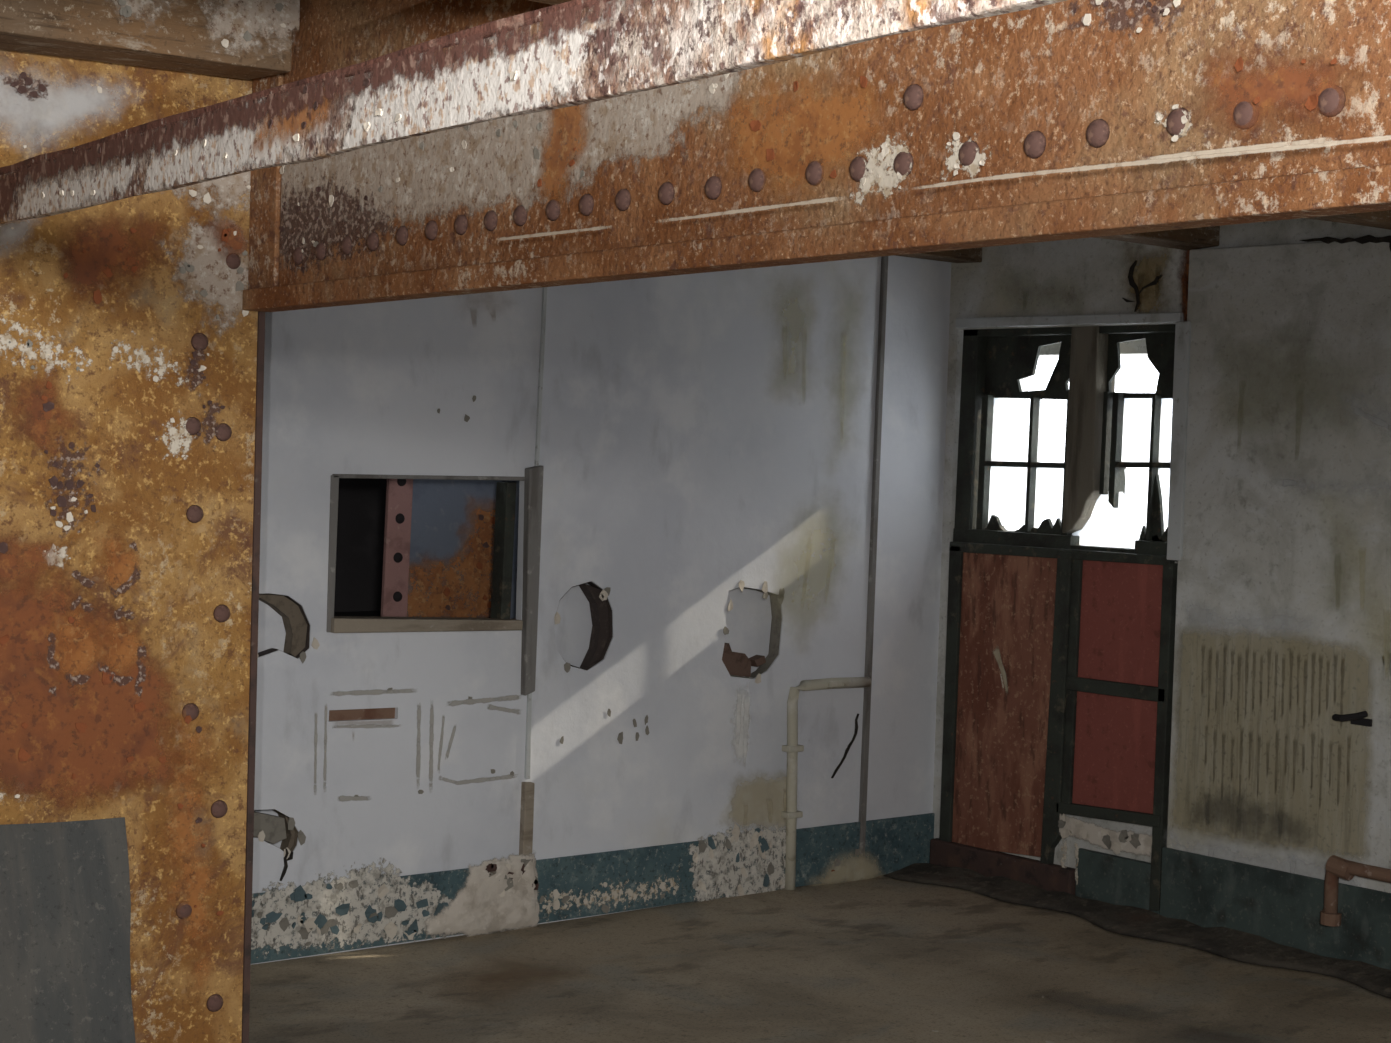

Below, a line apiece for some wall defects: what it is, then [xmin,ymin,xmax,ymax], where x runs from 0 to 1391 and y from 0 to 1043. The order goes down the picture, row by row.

corrosion [1064,0,1195,37]
peeling [0,21,605,335]
corrosion [0,0,650,220]
corrosion [280,176,410,274]
peeling [564,71,741,199]
corrosion [729,76,878,195]
peeling [922,104,1391,188]
crack [1300,235,1391,251]
corrosion [14,379,101,535]
spalling [722,580,785,684]
damp [1174,631,1369,856]
peeling [251,823,786,958]